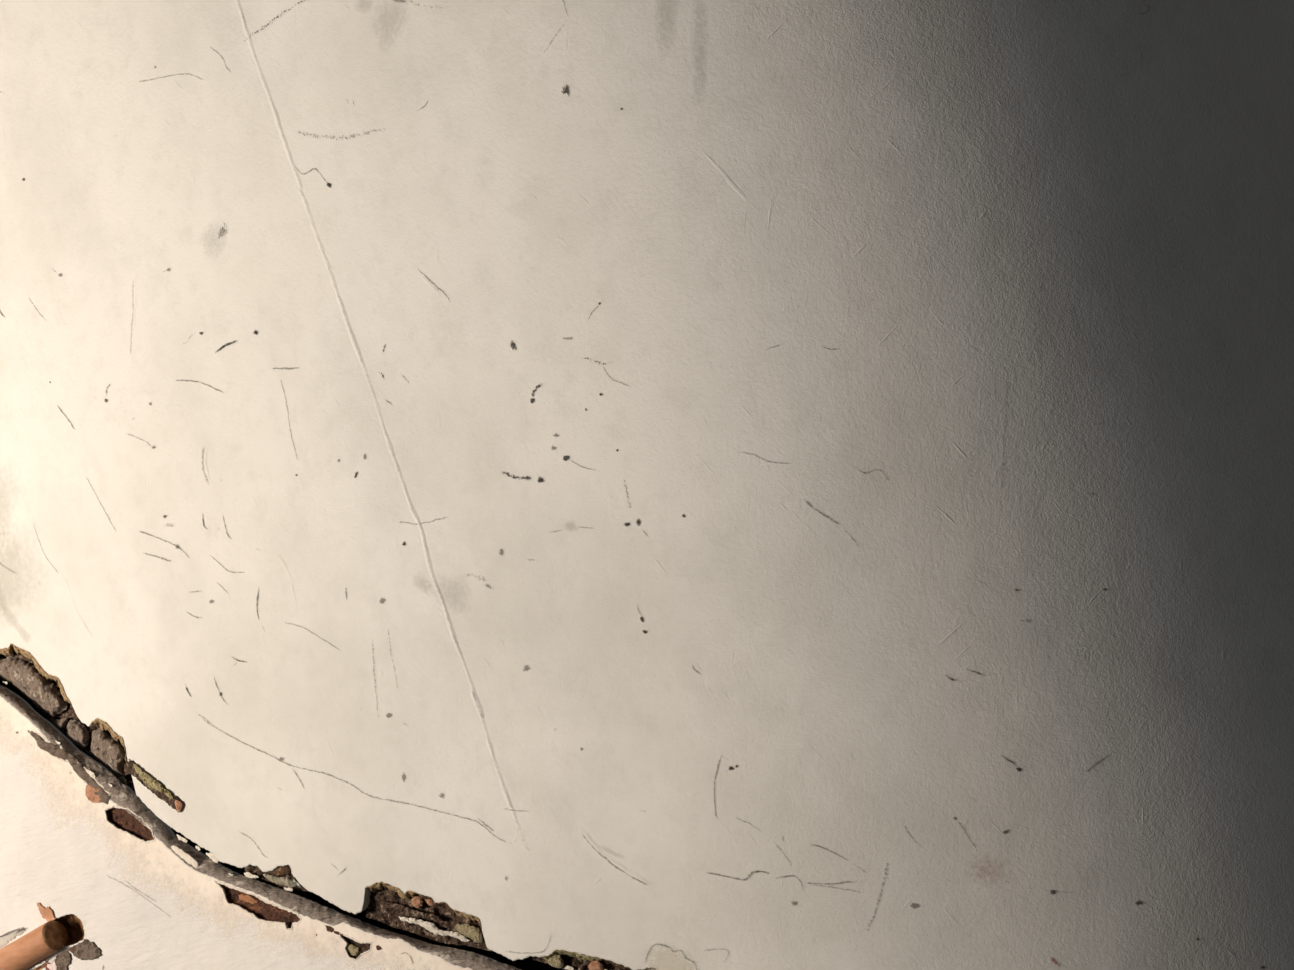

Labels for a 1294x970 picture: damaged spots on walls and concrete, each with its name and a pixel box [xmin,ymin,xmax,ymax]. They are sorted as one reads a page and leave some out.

peeling [0,644,491,970]
flaking render [533,950,656,970]